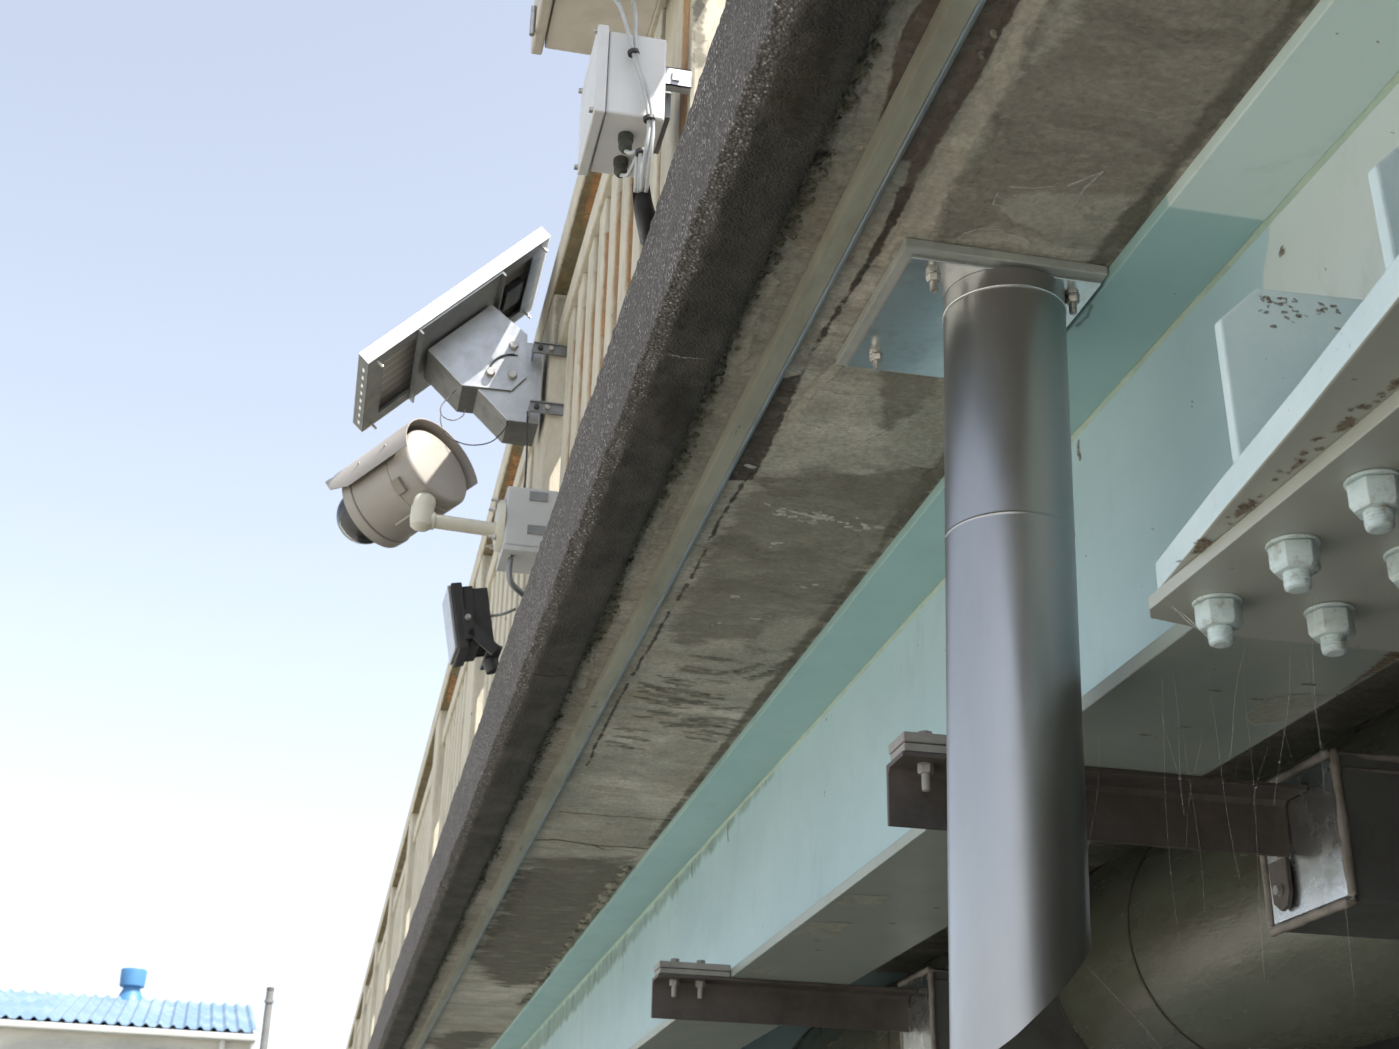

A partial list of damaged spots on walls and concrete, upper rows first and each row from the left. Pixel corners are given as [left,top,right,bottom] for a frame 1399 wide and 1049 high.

water stain [586,0,1314,840]
corrosion [1226,379,1399,526]
corrosion [1178,539,1213,563]
water stain [471,849,637,987]